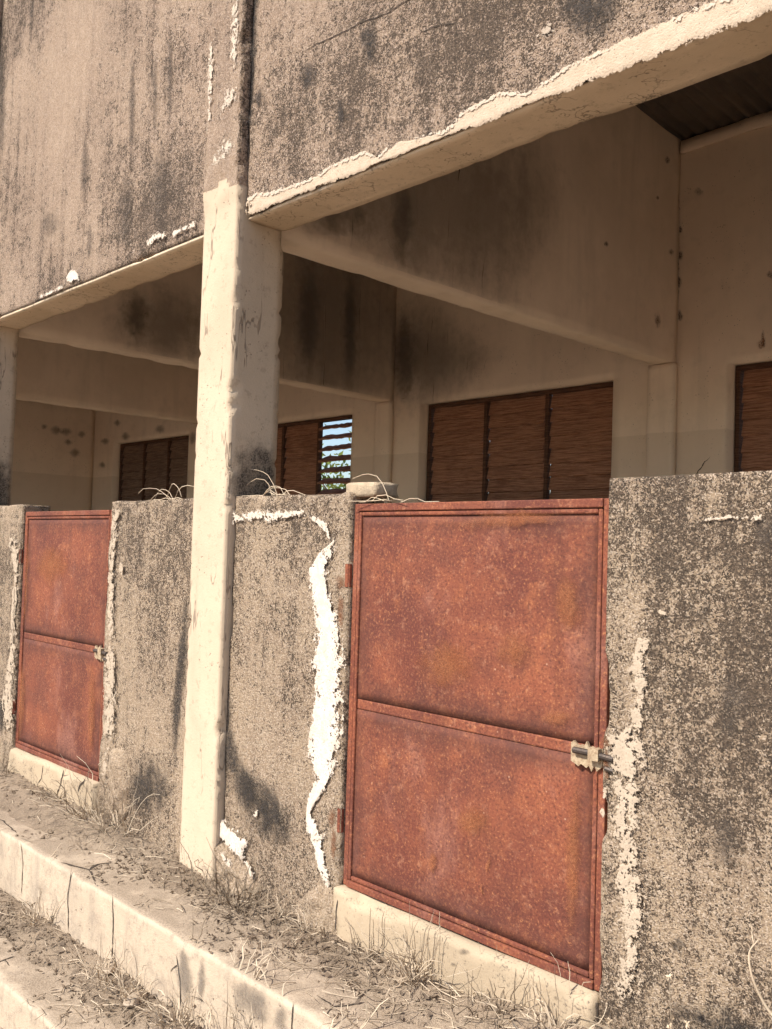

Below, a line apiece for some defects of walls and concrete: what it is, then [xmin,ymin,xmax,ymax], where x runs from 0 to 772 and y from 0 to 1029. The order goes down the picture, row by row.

water stain [248,0,261,123]
crack [304,0,408,52]
water stain [361,25,375,59]
flaking render [245,0,772,214]
flaking render [1,535,20,741]
flaking render [219,819,254,877]
water stain [225,695,288,838]
flaking render [232,509,346,888]
flaking render [599,619,654,1003]